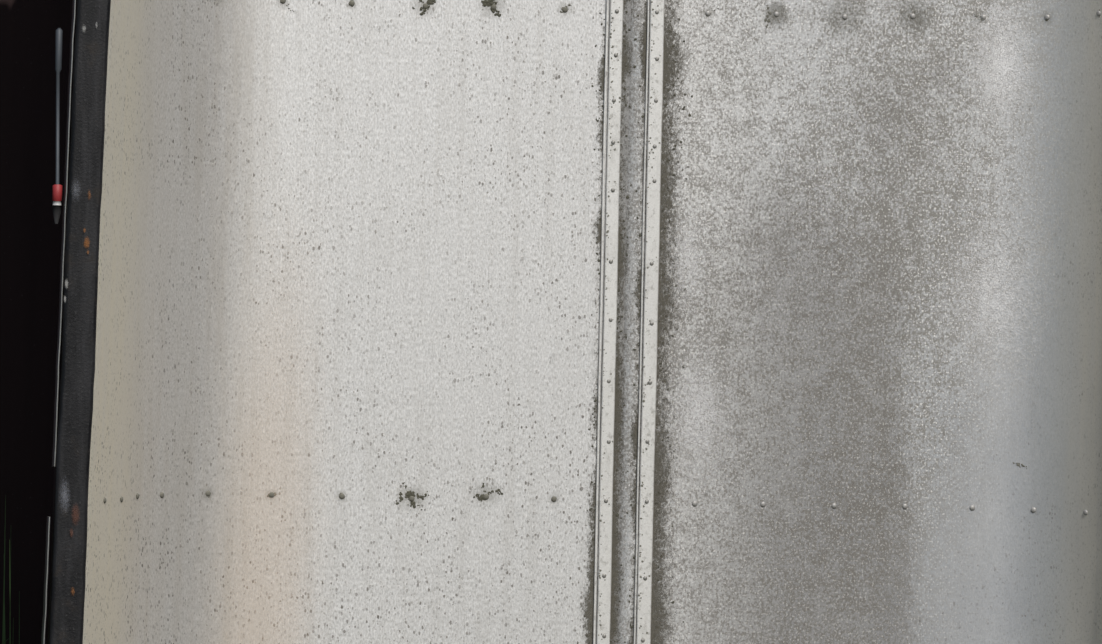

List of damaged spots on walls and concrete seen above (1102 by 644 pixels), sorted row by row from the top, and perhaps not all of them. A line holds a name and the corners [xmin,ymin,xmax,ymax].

leakage [954,215,1041,377]